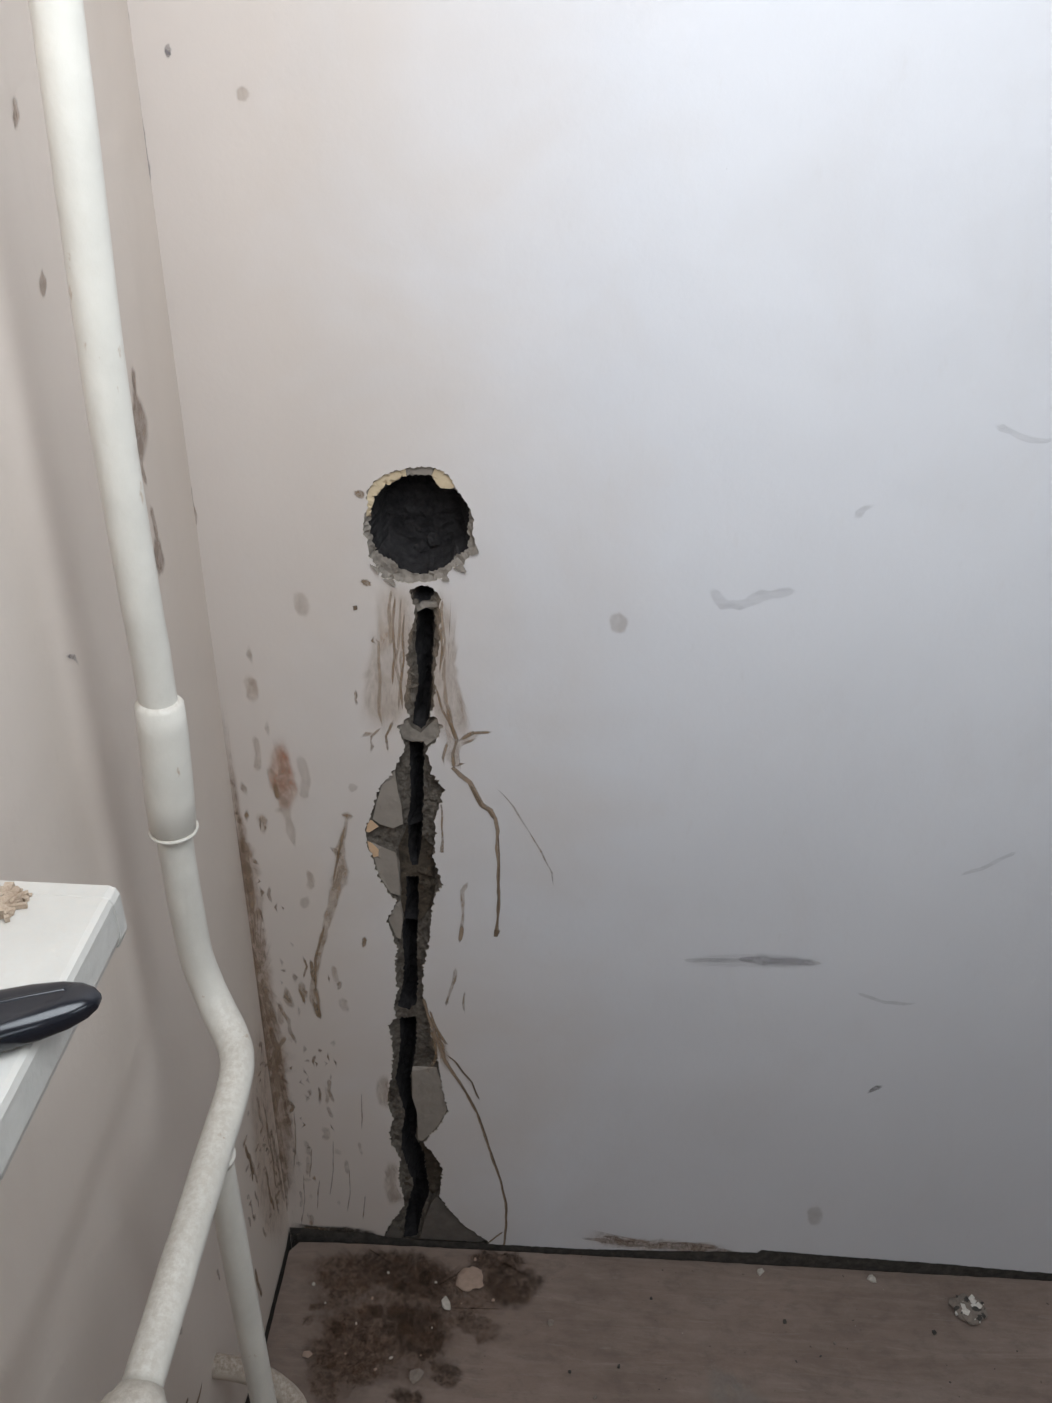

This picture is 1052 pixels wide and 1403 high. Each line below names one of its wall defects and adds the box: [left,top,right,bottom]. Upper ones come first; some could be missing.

spalling [355,466,479,1237]
crack [451,767,546,937]
damp [244,814,350,1234]
damp [303,1201,371,1233]
crack [422,999,508,1245]